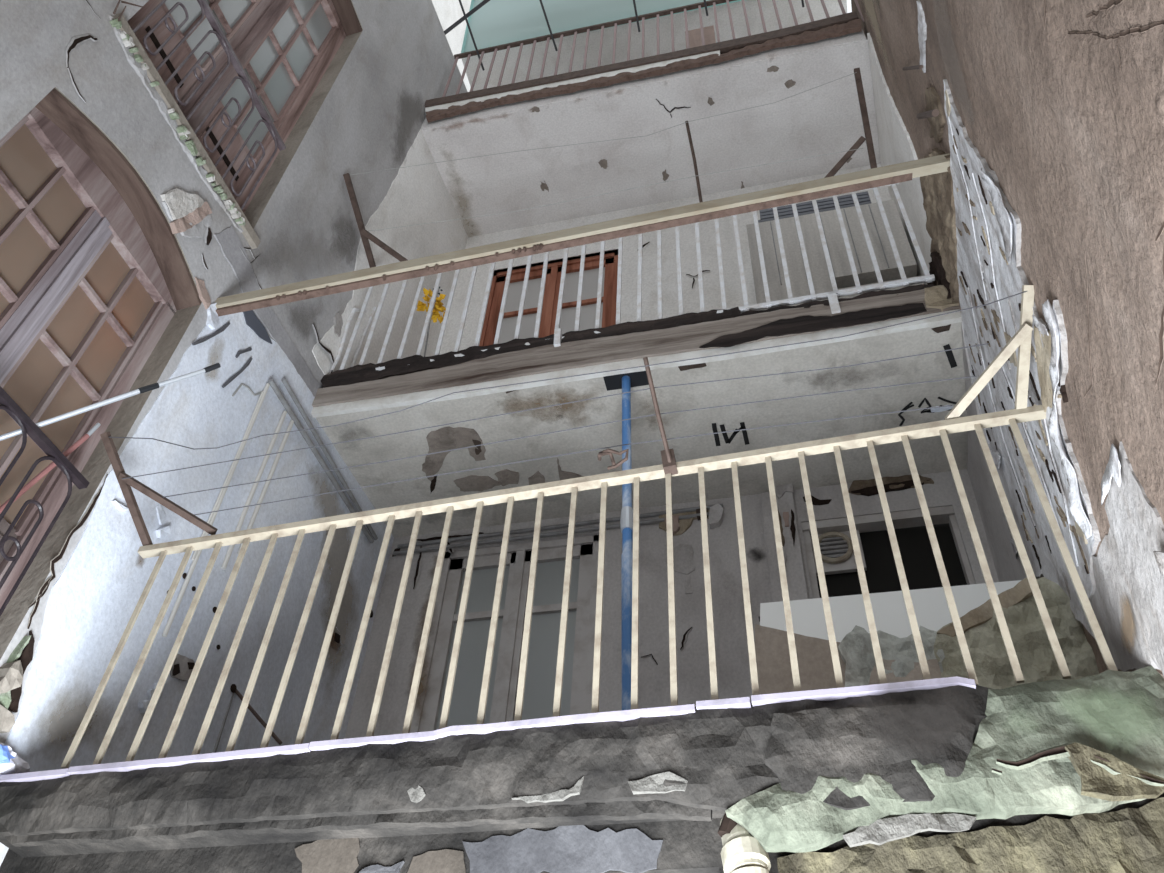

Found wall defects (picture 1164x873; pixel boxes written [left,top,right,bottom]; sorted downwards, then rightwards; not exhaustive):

crack [65,0,101,103]
crack [1044,0,1164,73]
crack [656,98,691,118]
crack [1155,222,1164,278]
crack [1155,307,1164,386]
peeling [422,427,486,492]
peeling [454,469,545,492]
crack [27,474,108,629]
flaking render [512,776,584,803]
flaking render [628,772,688,795]
flaking render [777,742,1164,873]
peeling [295,825,663,873]